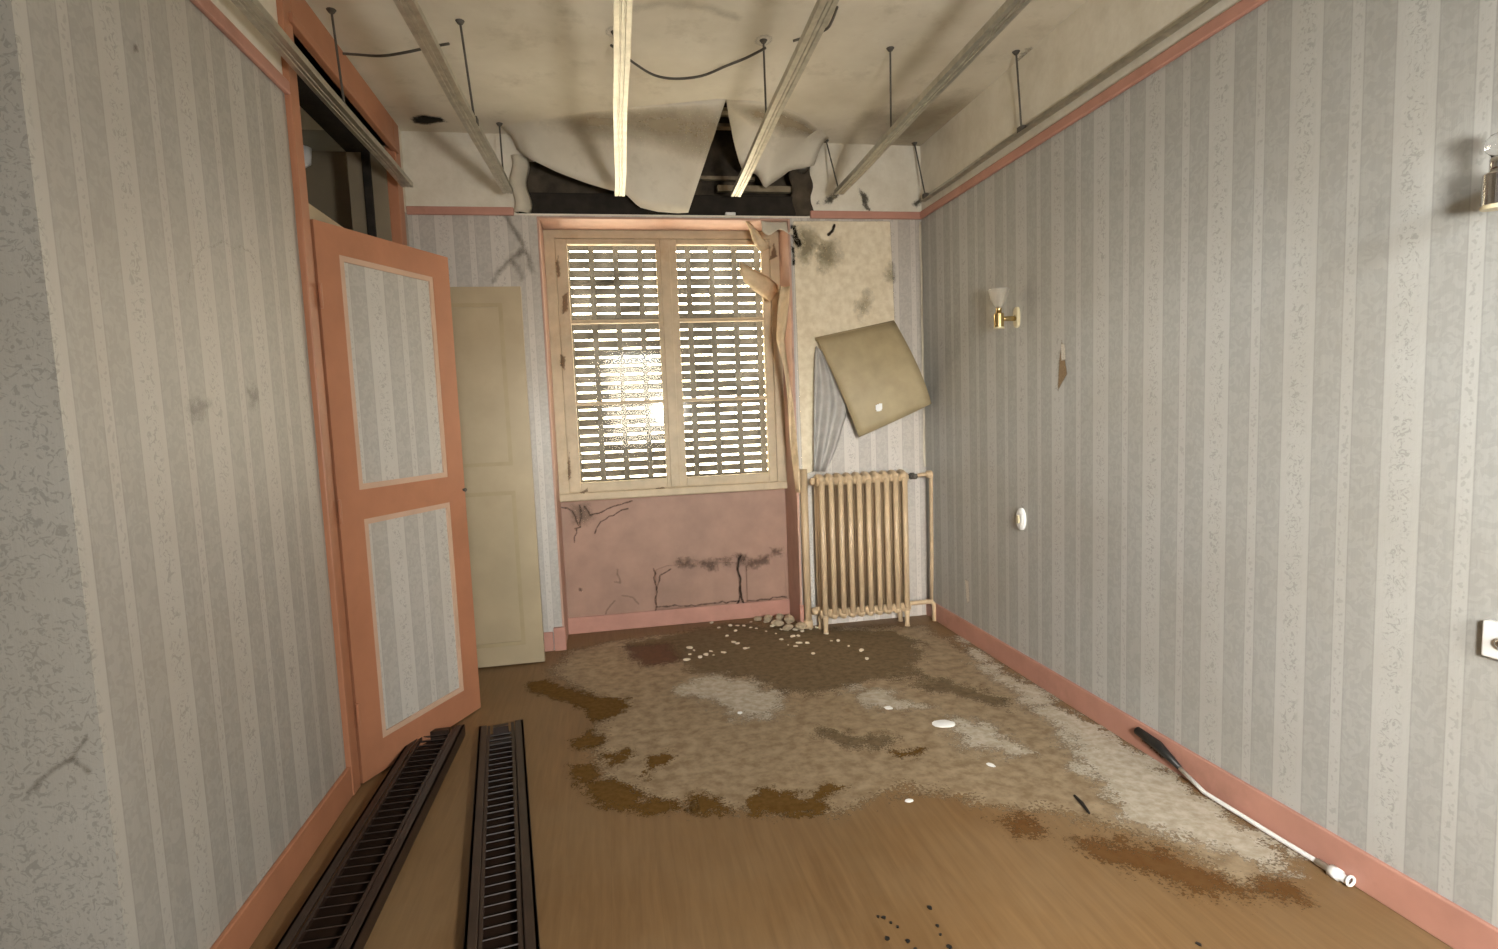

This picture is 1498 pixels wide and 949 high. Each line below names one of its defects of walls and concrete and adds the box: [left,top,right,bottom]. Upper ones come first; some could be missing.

flaking render [509,154,532,213]
water stain [790,225,832,265]
crack [561,501,631,542]
crack [653,556,786,611]